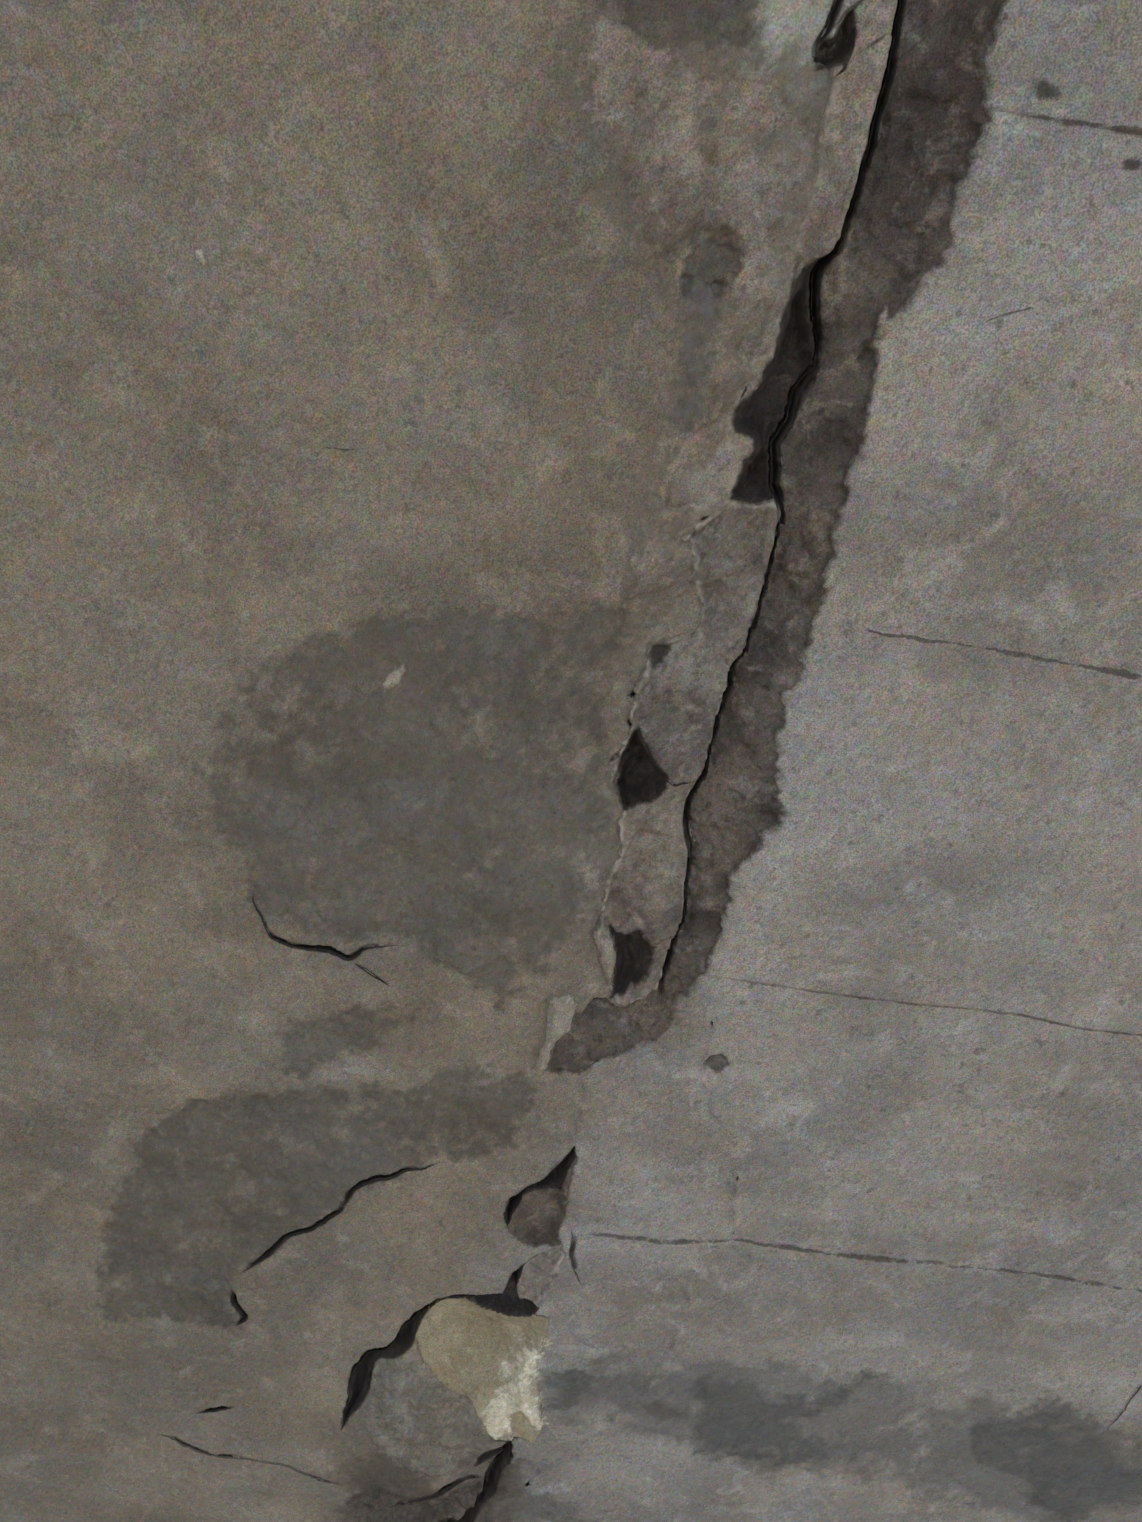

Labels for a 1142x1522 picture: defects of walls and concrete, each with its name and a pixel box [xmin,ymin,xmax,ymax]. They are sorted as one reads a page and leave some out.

crack [987,307,1030,322]
spalling [534,0,1006,1074]
crack [660,0,926,994]
crack [252,896,395,986]
crack [231,1163,438,1326]
crack [570,1230,580,1282]
spalling [346,1446,521,1522]
water stain [694,1374,873,1467]
water stain [971,1399,1142,1522]
crack [1109,1386,1142,1427]